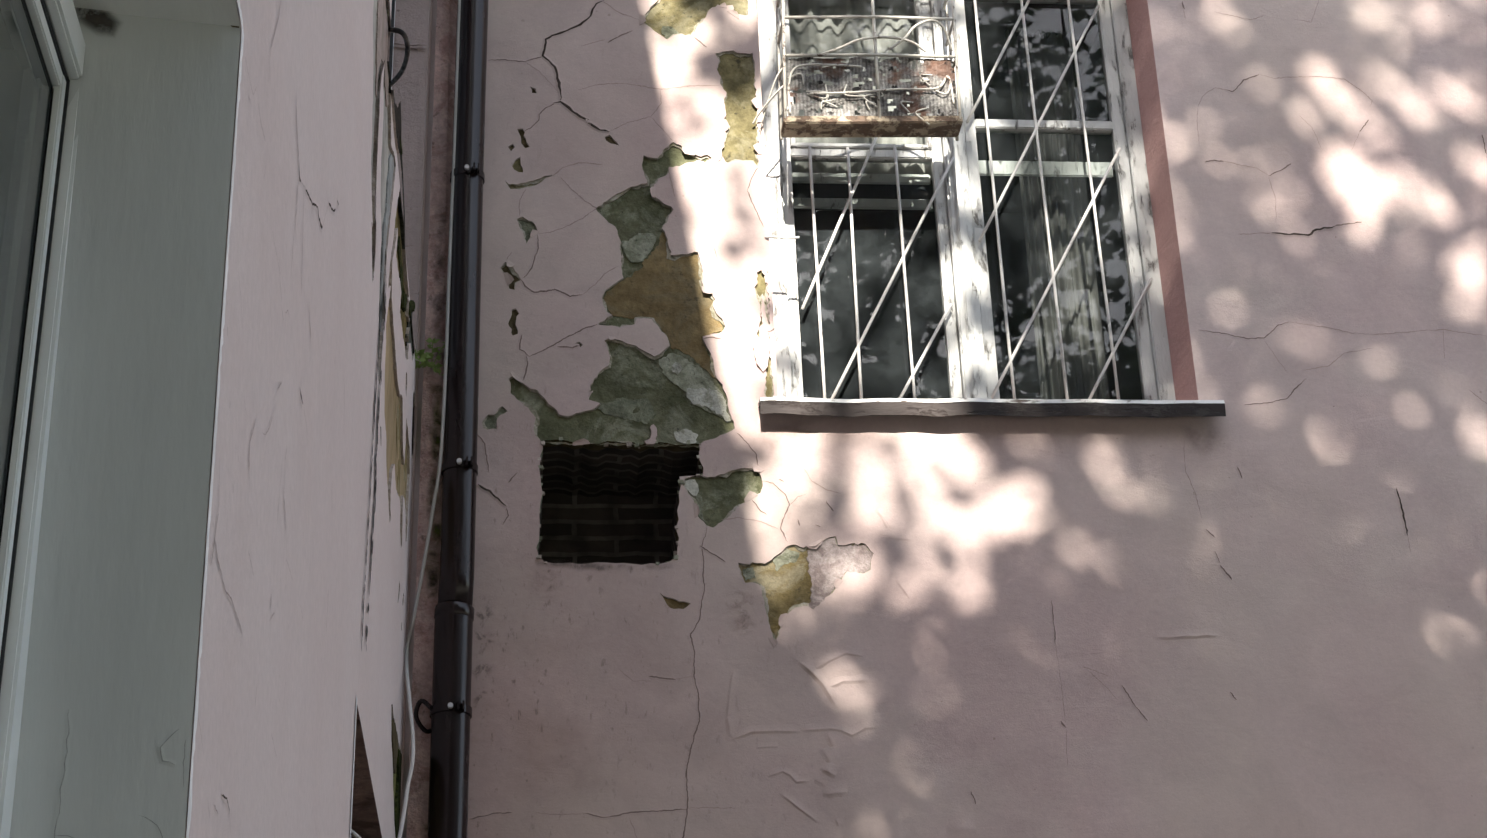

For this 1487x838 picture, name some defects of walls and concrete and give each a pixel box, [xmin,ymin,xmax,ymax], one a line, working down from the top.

spalling [639,0,749,39]
crack [245,2,339,340]
spalling [371,0,415,509]
crack [488,0,722,381]
spalling [482,51,764,565]
crack [703,246,738,341]
crack [746,167,765,227]
spalling [753,268,774,397]
crack [1197,73,1372,238]
crack [468,432,838,838]
spalling [739,537,873,647]
spalling [391,719,402,838]